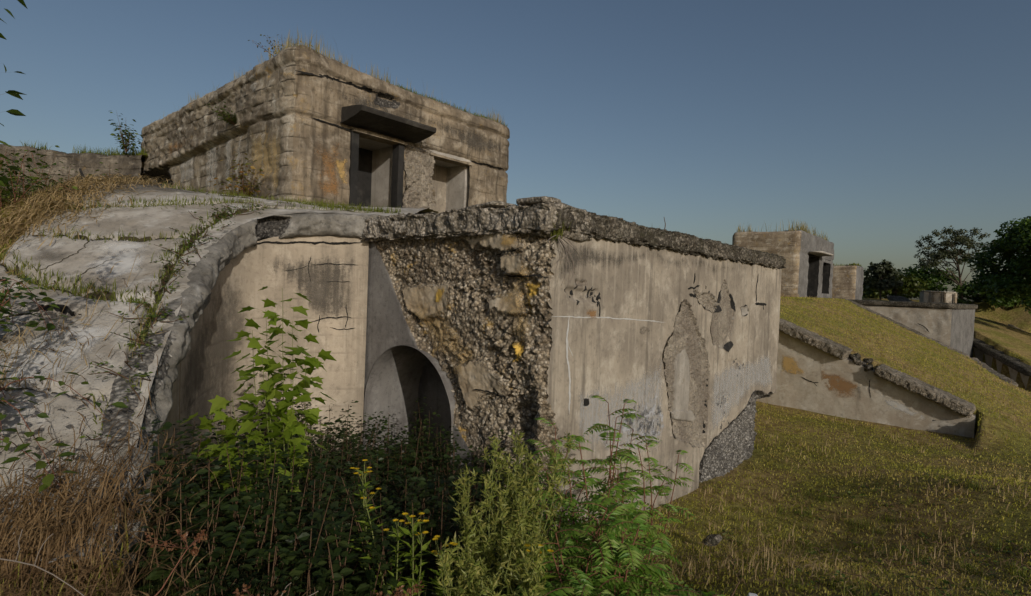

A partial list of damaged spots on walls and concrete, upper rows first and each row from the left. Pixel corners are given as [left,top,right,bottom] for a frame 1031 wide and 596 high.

crack [254,241,362,332]
spalling [374,233,563,516]
spalling [564,279,601,317]
flaking render [617,279,773,488]